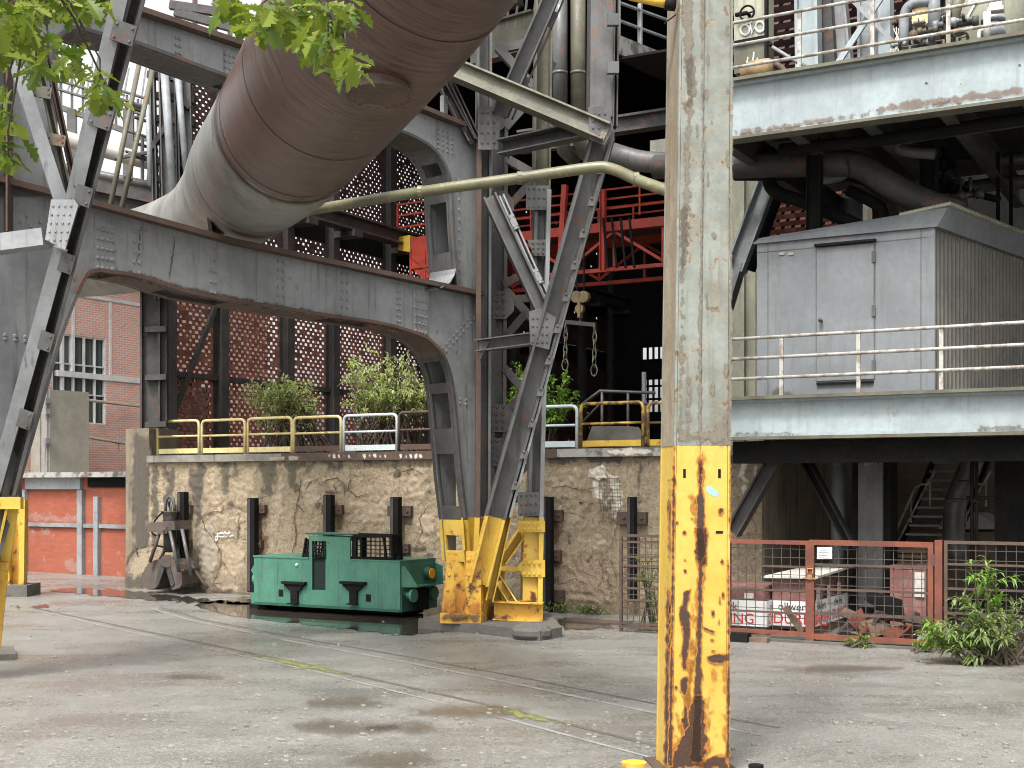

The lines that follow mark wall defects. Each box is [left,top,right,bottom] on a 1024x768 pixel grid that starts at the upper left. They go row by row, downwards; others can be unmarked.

rust [736,87,1023,135]
peeling [677,0,734,445]
crack [201,505,247,584]
crack [292,477,369,552]
spalling [547,465,622,609]
rust [443,588,483,622]
rust [663,446,731,768]